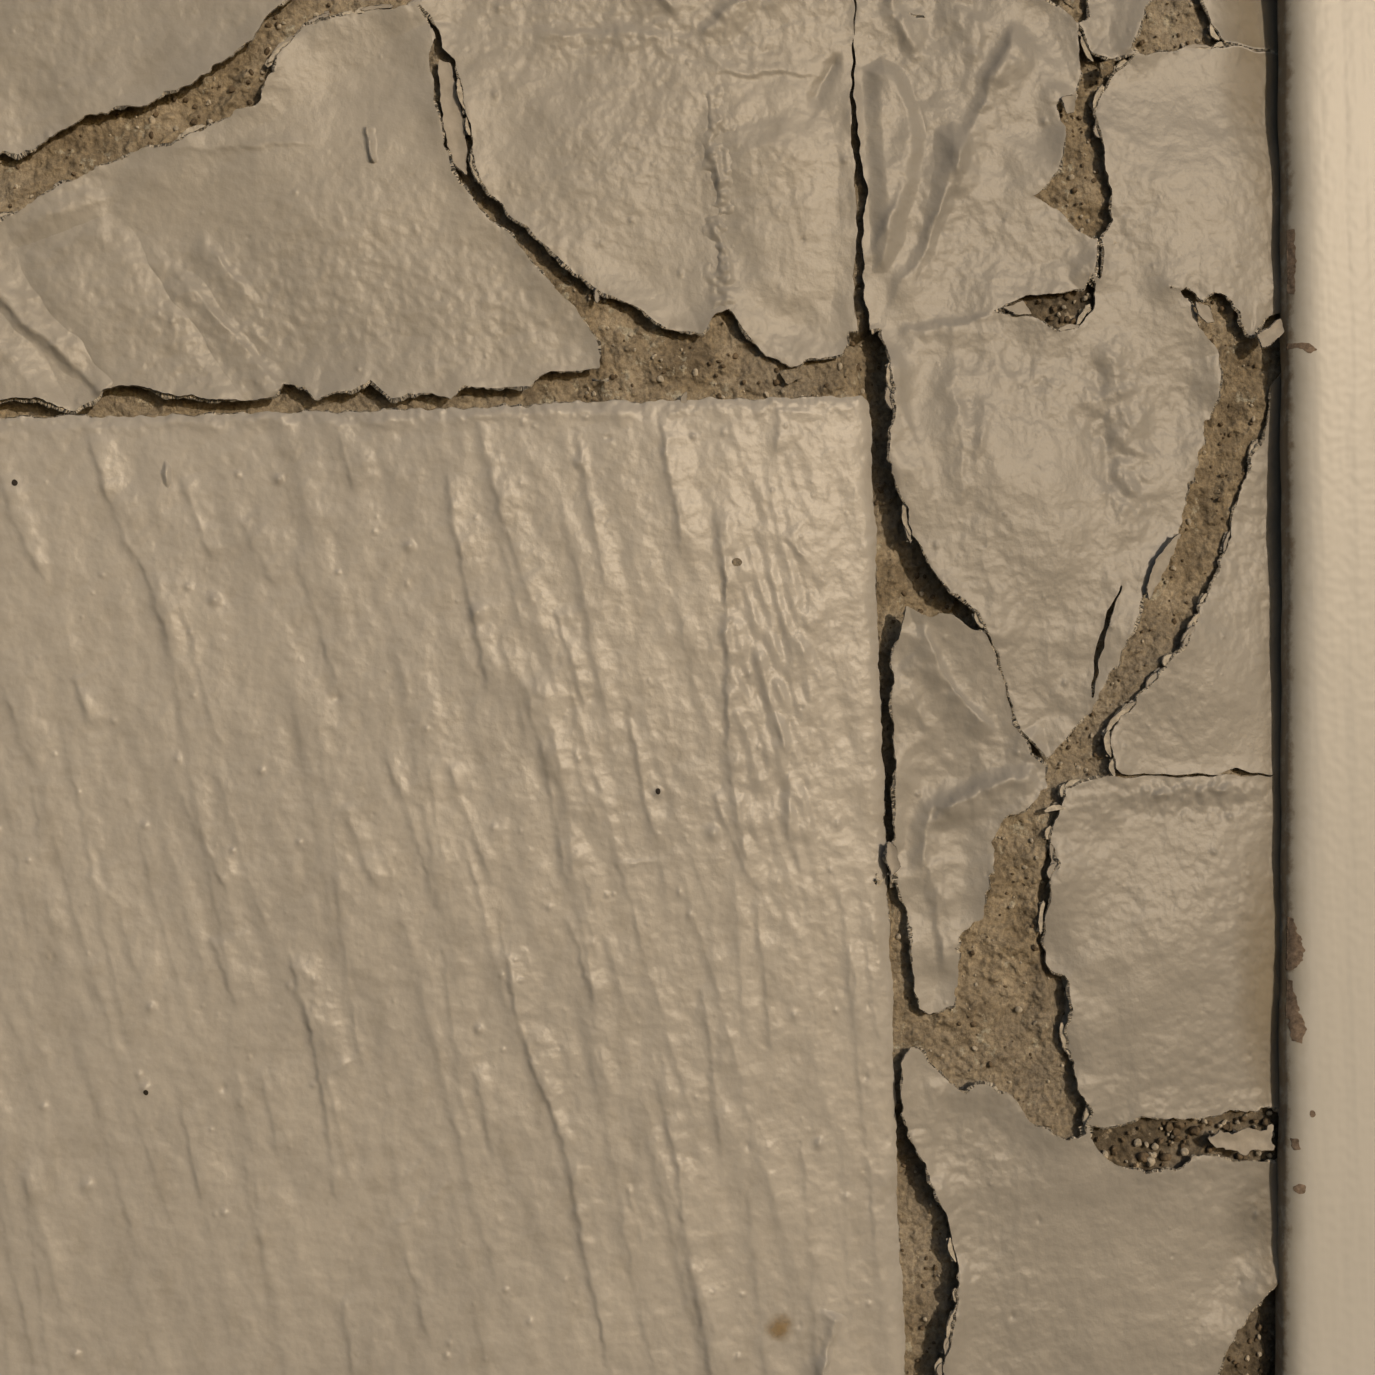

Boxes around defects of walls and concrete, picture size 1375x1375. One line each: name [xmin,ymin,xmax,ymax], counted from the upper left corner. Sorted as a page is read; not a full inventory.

peeling [0,0,413,222]
crack [849,0,873,342]
peeling [1034,0,1278,331]
spalling [571,274,1317,1375]